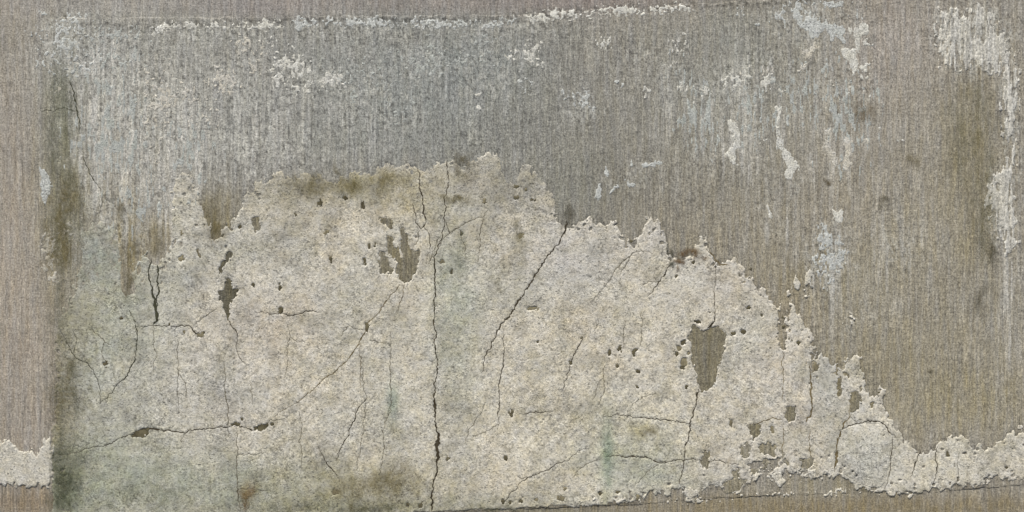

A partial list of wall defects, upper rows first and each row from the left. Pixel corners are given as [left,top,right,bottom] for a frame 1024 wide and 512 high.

spalling [218,246,239,321]
crack [55,259,405,511]
spalling [363,217,420,283]
crack [412,162,487,511]
crack [465,221,670,443]
crack [505,369,739,501]
peeling [444,424,901,512]
spalling [675,312,746,393]
crack [707,250,728,328]
crack [746,356,959,487]
spalling [849,391,863,413]
peeling [906,466,1024,494]